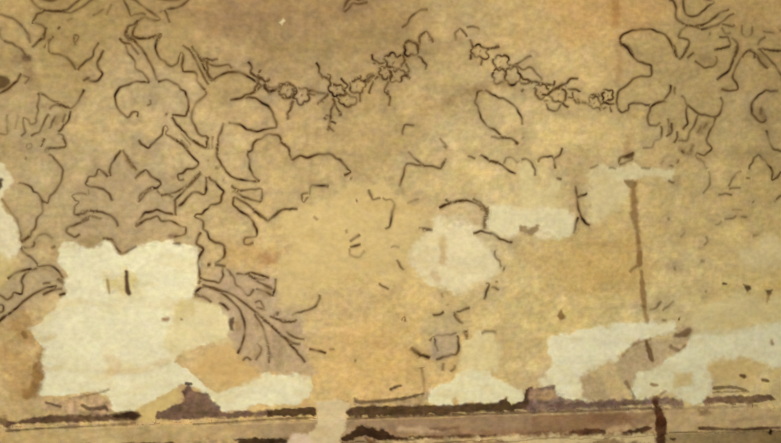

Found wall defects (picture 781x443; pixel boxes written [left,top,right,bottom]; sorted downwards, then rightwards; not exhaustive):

damp [42,28,82,71]
damp [40,97,75,128]
peeling [0,161,22,282]
peeling [34,240,655,443]
peeling [265,161,575,310]
damp [498,217,667,323]
peeling [533,229,781,404]
flaking render [0,413,13,431]